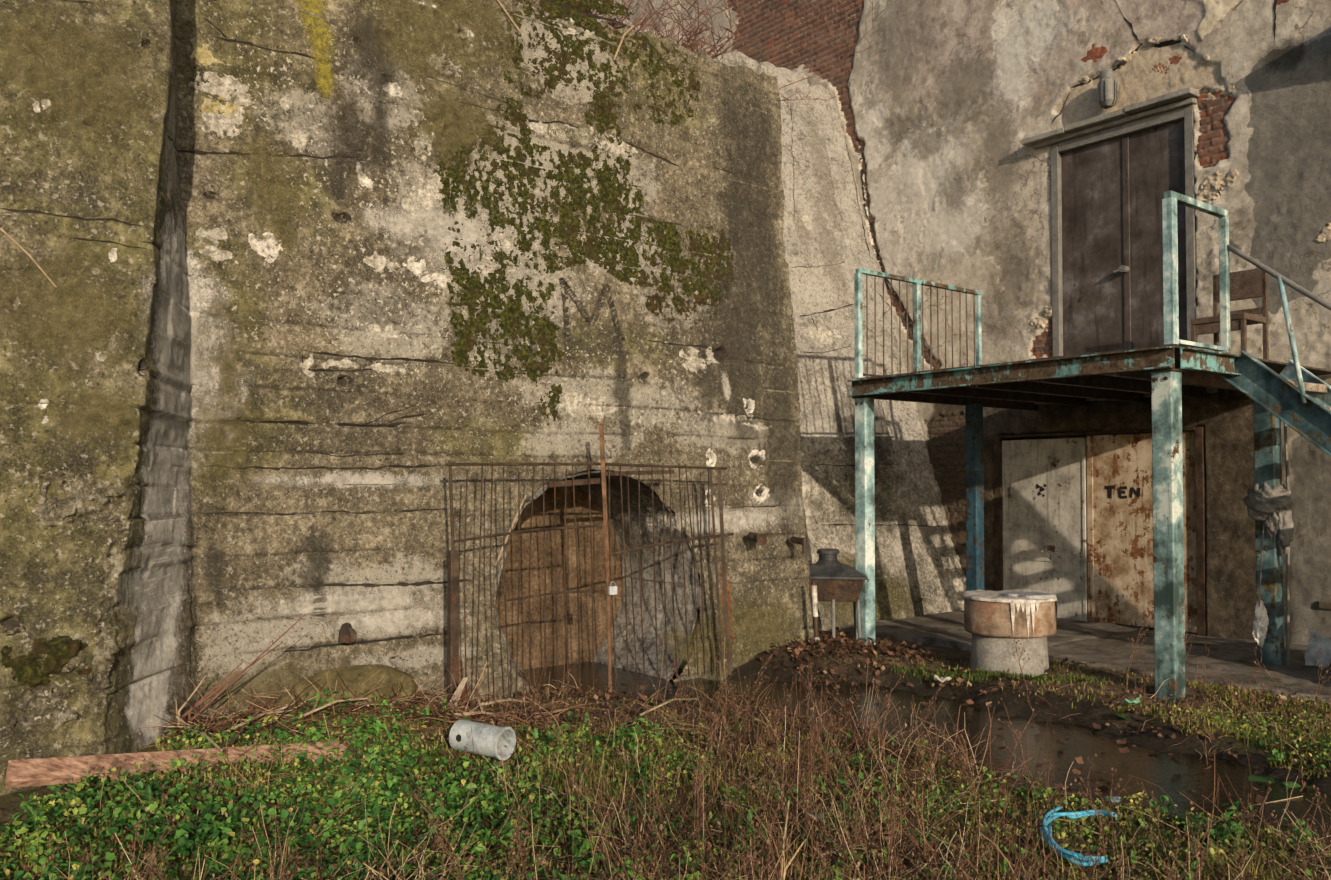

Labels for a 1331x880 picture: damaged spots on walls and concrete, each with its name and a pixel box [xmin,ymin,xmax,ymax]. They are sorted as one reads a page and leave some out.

leakage [316,22,476,200]
flaking render [728,0,942,370]
crack [1051,0,1194,124]
peeling [1149,0,1239,74]
flaking render [1195,86,1239,204]
crack [1235,0,1277,43]
crack [792,136,928,353]
crack [645,339,773,365]
spalling [708,406,771,431]